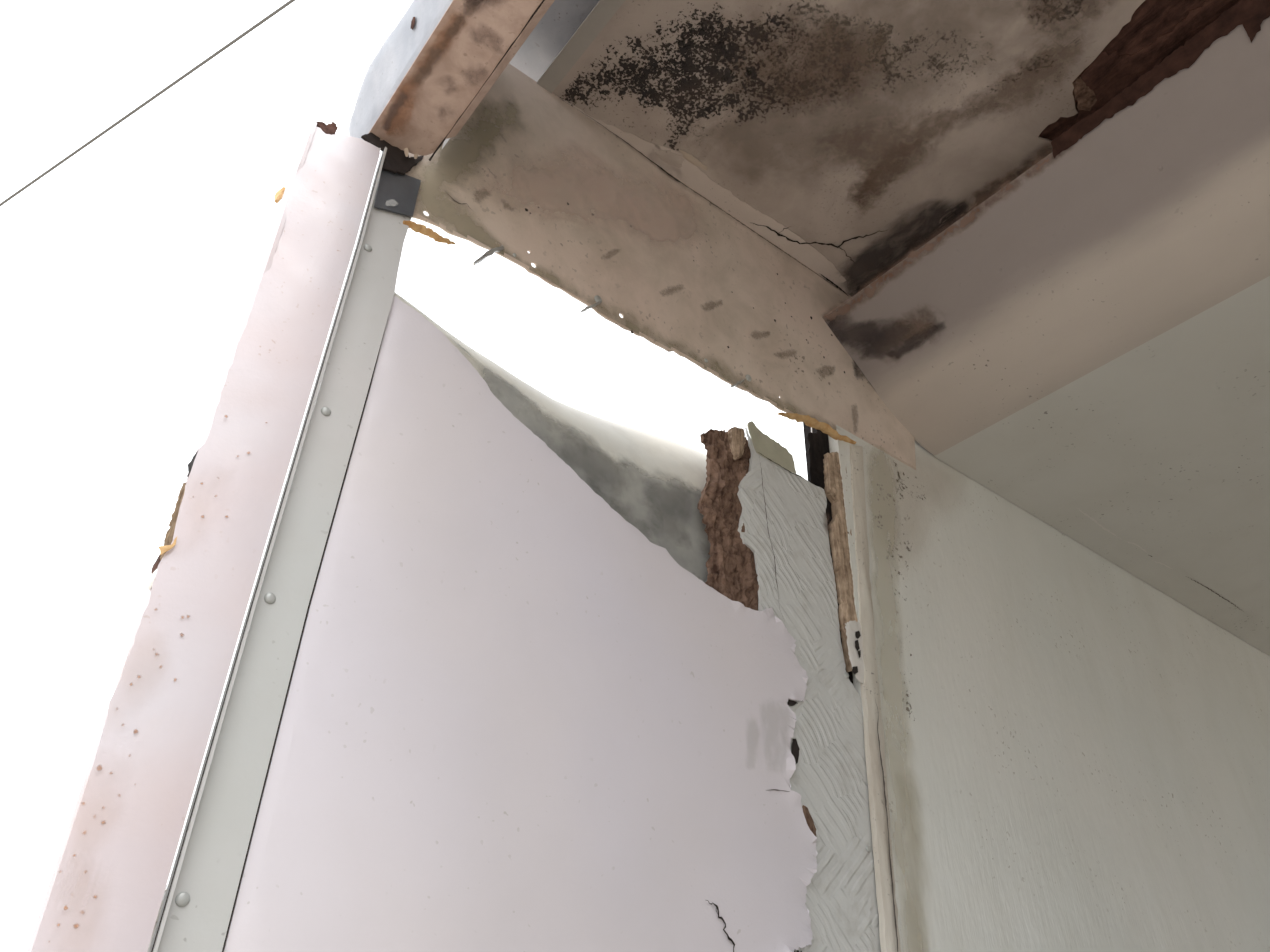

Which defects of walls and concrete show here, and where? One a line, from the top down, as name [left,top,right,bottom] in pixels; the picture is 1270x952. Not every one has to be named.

crack [429,0,545,161]
leakage [559,0,983,150]
peeling [1051,0,1270,159]
crack [559,98,887,296]
leakage [844,147,1053,295]
leakage [826,314,943,384]
peeling [147,451,198,590]
leakage [484,369,711,583]
peeling [747,421,796,473]
peeling [845,621,864,684]
peeling [802,805,816,836]
crack [706,900,735,952]